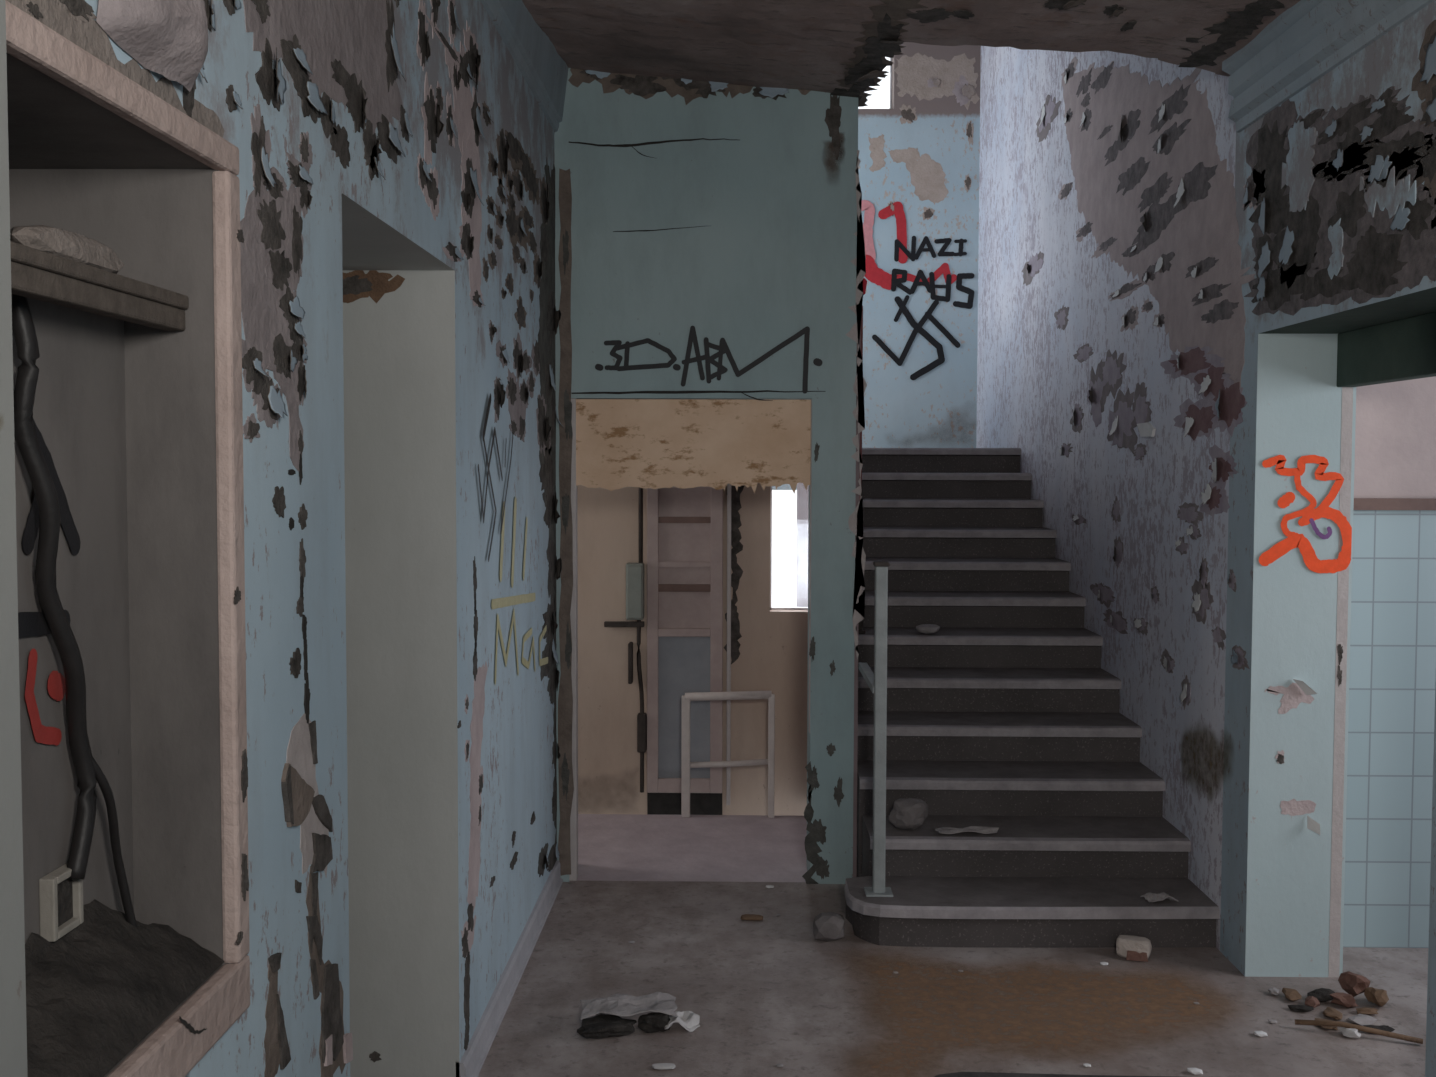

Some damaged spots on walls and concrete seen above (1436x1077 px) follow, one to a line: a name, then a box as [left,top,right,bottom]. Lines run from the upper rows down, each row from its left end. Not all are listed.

flaking render [568,0,980,145]
crack [569,138,737,158]
crack [613,225,703,233]
peeling [1021,251,1044,286]
peeling [1036,0,1436,670]
peeling [6,0,574,912]
flaking render [809,636,836,676]
peeling [1160,648,1191,710]
flaking render [802,761,844,884]
peeling [281,713,382,1077]
peeling [264,953,291,1077]
damp [857,958,1229,1077]